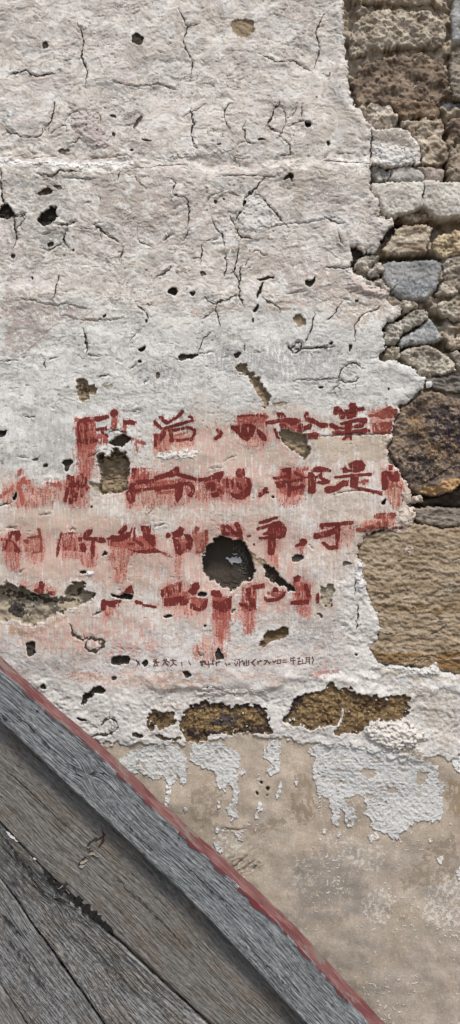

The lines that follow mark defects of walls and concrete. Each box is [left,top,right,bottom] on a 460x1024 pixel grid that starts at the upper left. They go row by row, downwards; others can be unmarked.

crack [0,10,374,384]
hole [350,247,363,269]
crack [254,282,400,388]
flaking render [44,345,402,562]
flaking render [0,516,335,627]
flaking render [132,682,411,744]
peeling [213,812,243,854]
peeling [255,774,298,819]